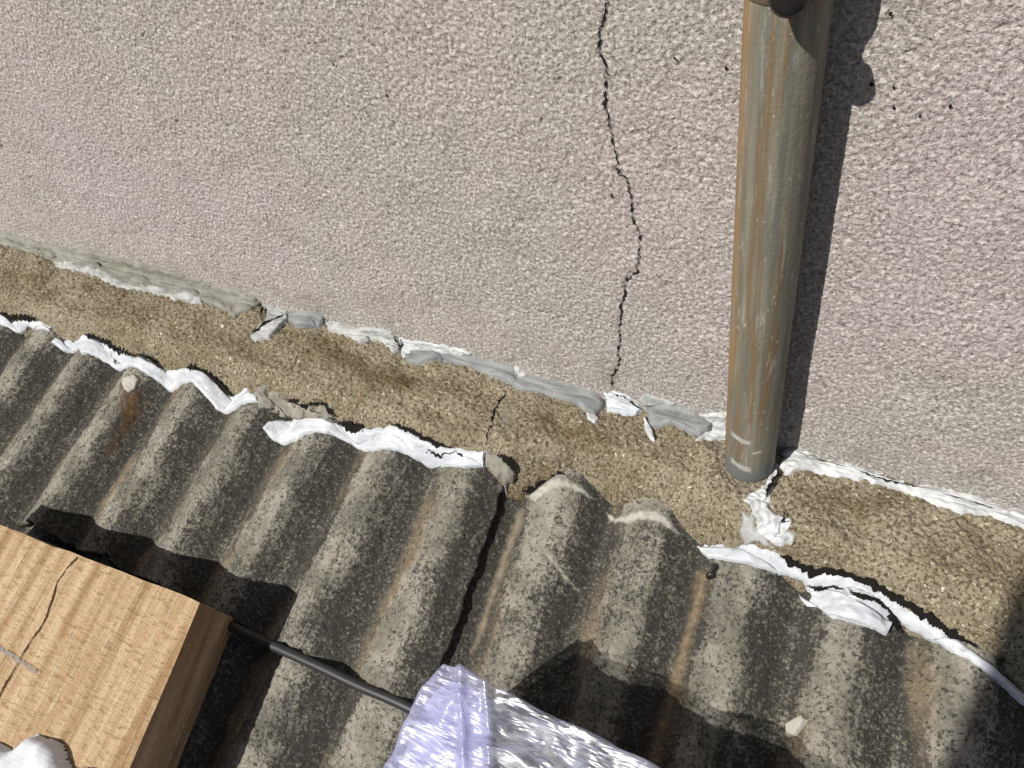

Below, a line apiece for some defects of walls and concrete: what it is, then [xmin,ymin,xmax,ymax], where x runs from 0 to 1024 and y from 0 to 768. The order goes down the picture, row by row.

crack [597,1,642,389]
corrosion [122,389,139,426]
crack [485,393,506,445]